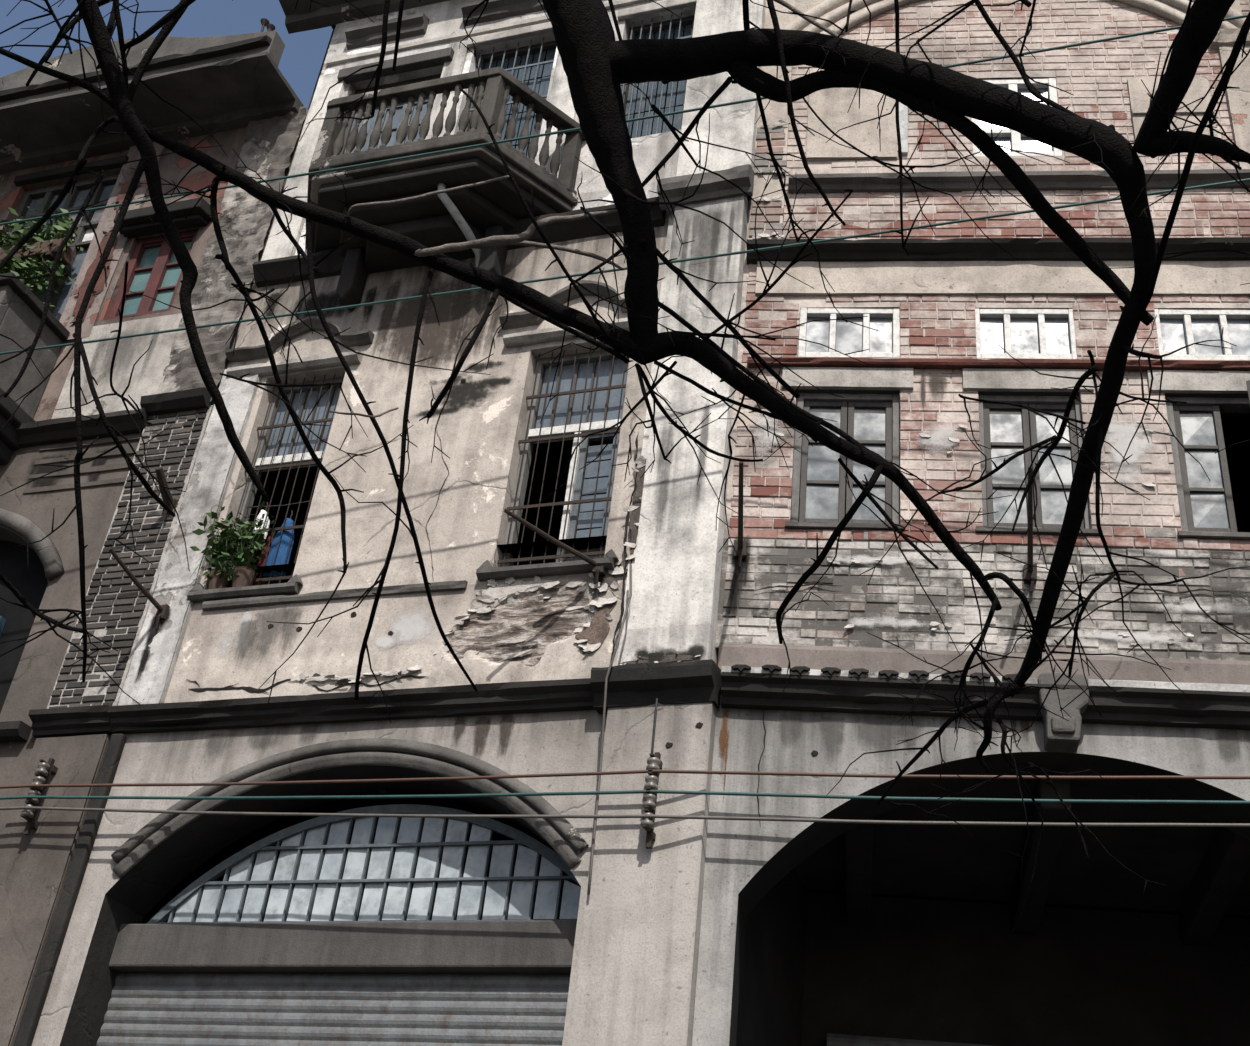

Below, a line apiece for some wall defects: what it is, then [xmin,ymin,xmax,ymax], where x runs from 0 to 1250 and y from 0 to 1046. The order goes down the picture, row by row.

flaking render [433,456,646,667]
leakage [454,715,514,754]
corrosion [719,710,729,786]
leakage [859,717,916,747]